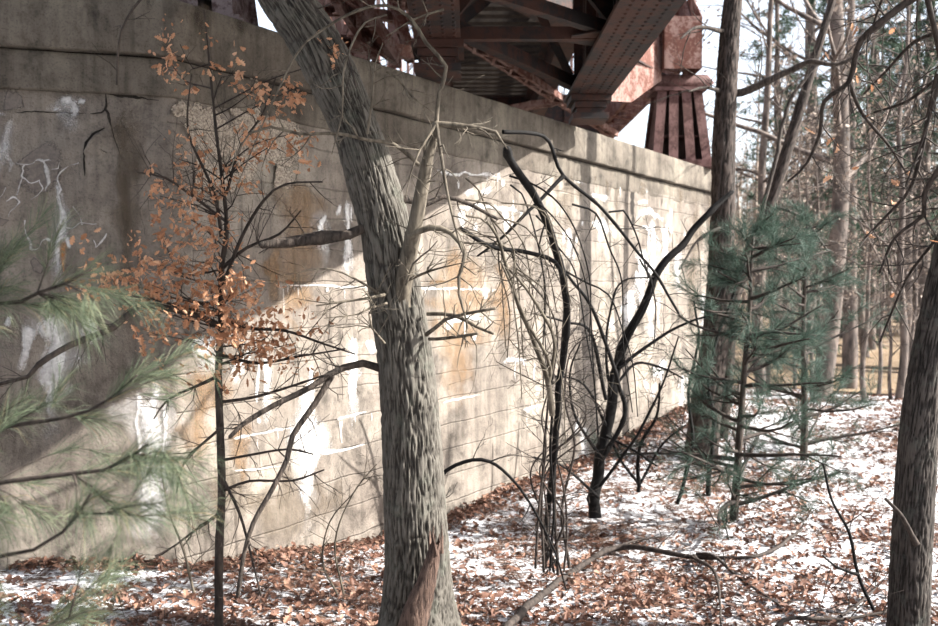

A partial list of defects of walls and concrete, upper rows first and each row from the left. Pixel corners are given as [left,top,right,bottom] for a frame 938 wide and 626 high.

crack [0,93,159,251]